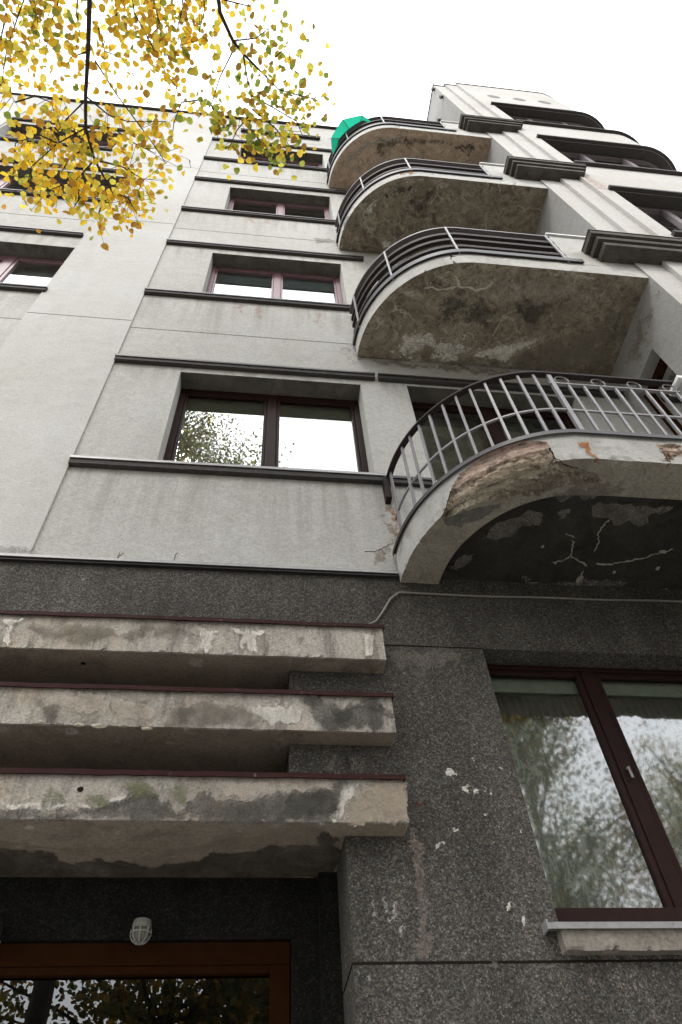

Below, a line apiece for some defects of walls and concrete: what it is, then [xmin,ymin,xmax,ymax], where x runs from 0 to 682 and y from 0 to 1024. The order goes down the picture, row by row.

leakage [385,310,652,375]
rust [577,442,599,463]
spalling [442,440,673,540]
crack [552,520,673,576]
leakage [3,618,218,653]
leakage [232,628,265,652]
leakage [115,699,301,730]
leakage [332,705,386,730]
leakage [0,782,409,879]